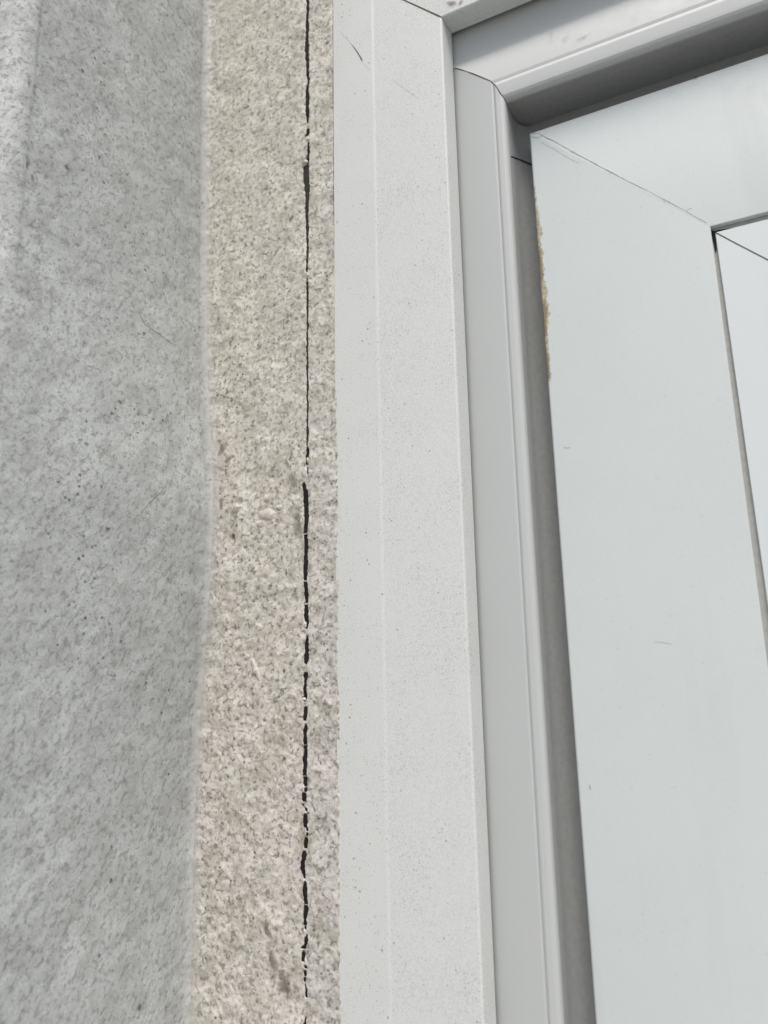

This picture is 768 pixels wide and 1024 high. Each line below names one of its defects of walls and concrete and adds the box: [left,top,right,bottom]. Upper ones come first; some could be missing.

crack [300,0,311,1024]